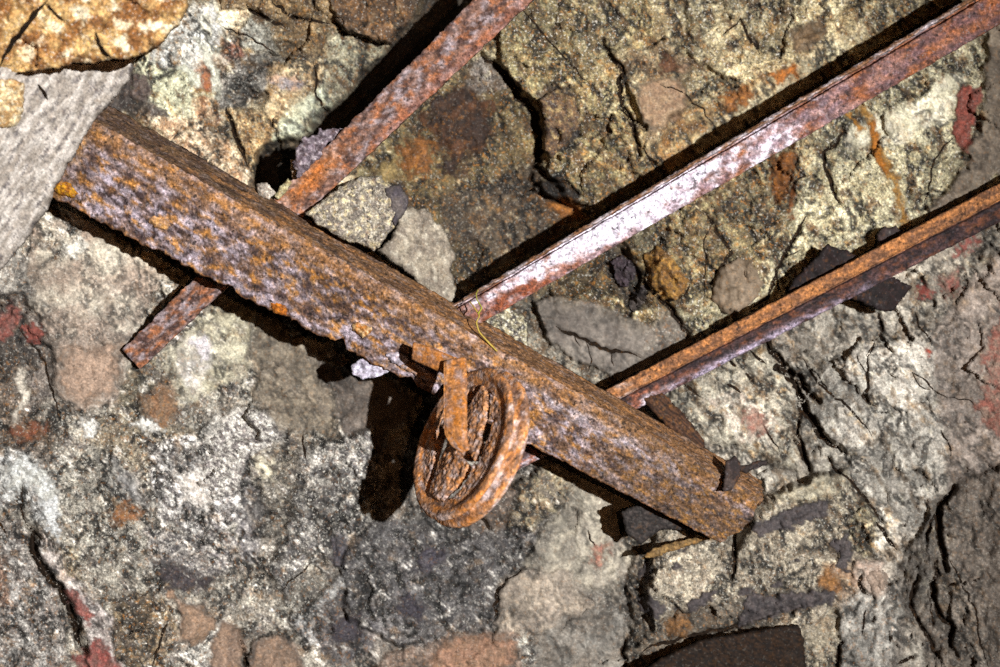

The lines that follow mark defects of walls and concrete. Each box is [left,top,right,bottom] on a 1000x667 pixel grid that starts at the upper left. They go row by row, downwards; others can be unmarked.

rust [292,128,342,178]
crack [481,56,578,210]
rust [548,198,584,220]
rust [718,84,754,112]
rust [769,143,797,220]
rust [846,104,908,229]
rust [351,358,438,384]
crack [727,312,897,550]
crack [912,372,988,421]
crack [0,485,84,650]
crack [835,574,885,667]
crack [898,488,989,667]